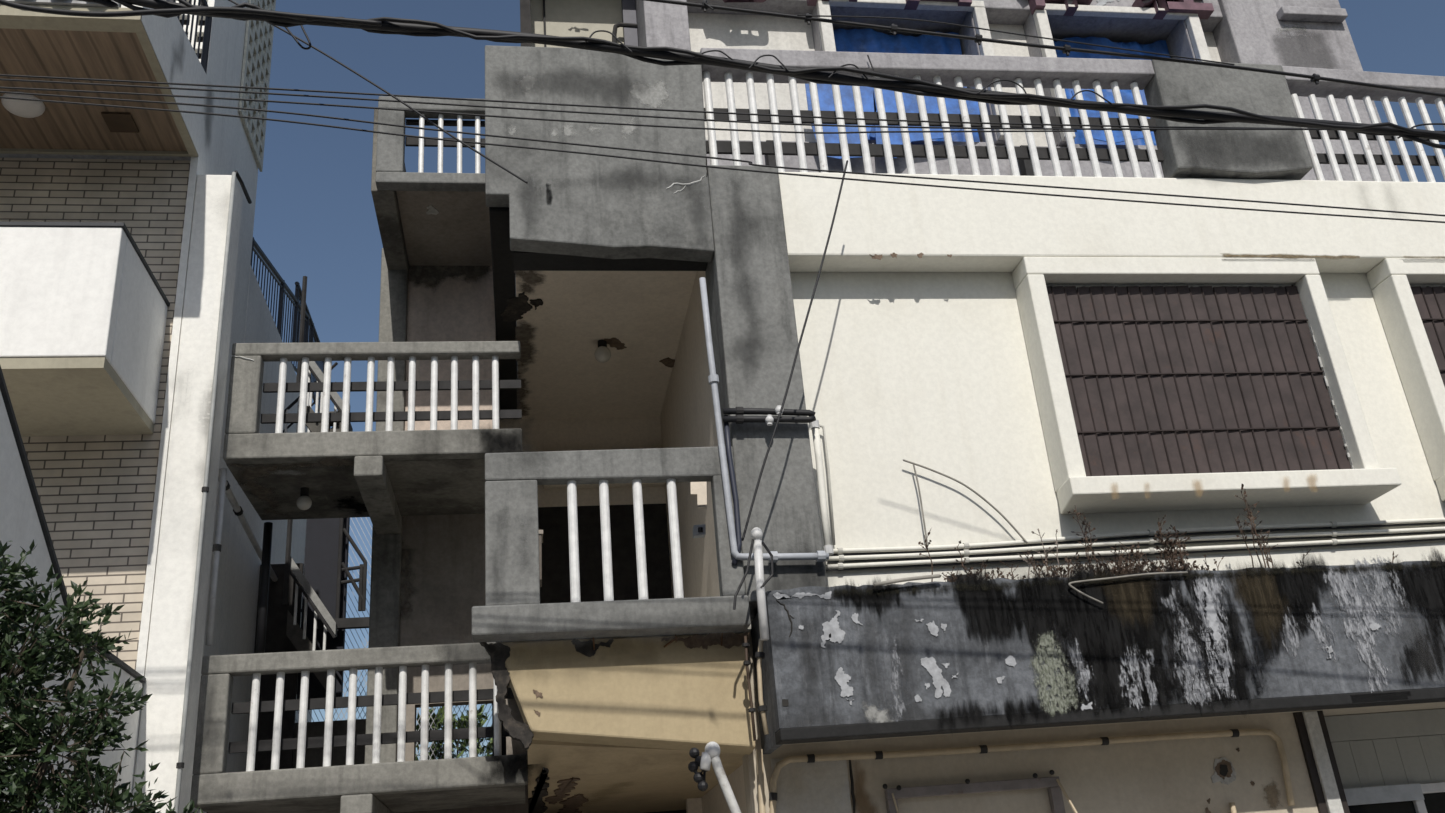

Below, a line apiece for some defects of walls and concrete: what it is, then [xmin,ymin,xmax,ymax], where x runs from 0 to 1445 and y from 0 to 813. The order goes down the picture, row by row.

spalling [500,292,543,322]
spalling [571,638,614,657]
spalling [661,632,749,650]
peeling [773,591,863,648]
peeling [914,619,947,637]
leakage [834,550,1445,727]
spalling [479,642,543,750]
peeling [834,636,958,723]
spalling [528,767,589,813]
spalling [1205,748,1255,813]